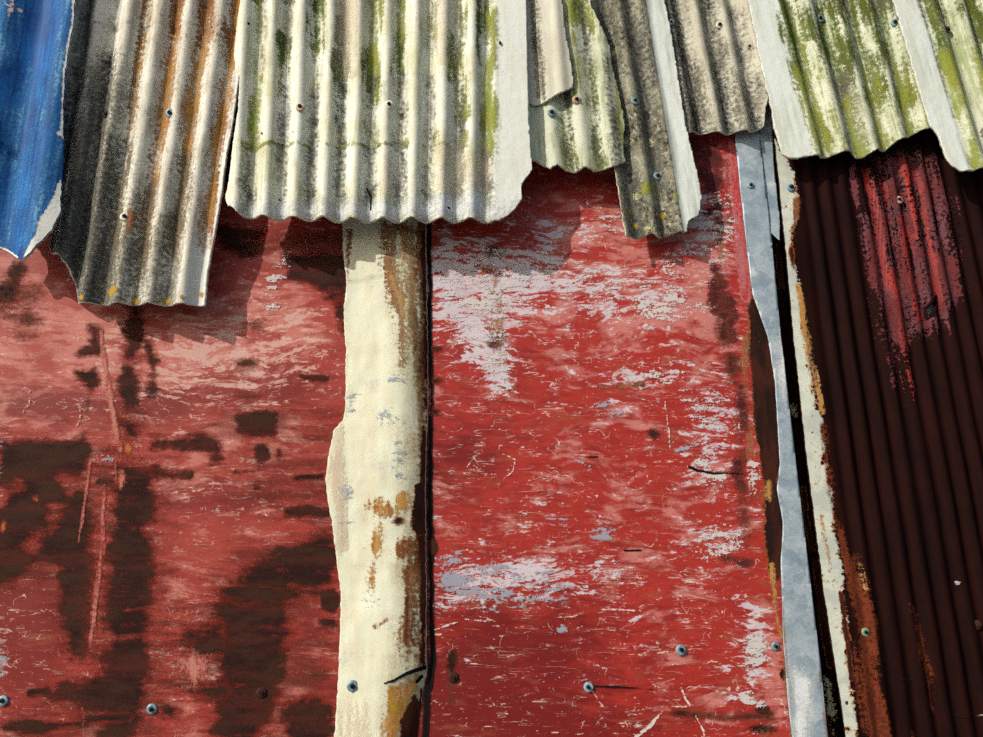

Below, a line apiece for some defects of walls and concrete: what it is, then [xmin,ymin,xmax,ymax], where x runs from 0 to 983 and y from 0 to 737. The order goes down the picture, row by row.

rust [112,0,352,336]
leakage [305,0,408,221]
leakage [559,0,667,238]
peeling [575,192,738,330]
leakage [665,0,763,134]
leakage [791,0,920,157]
peeling [848,145,964,401]
rust [0,304,193,737]
rust [181,534,340,737]
rust [364,220,458,737]
peeling [427,550,571,614]
peeling [622,367,740,429]